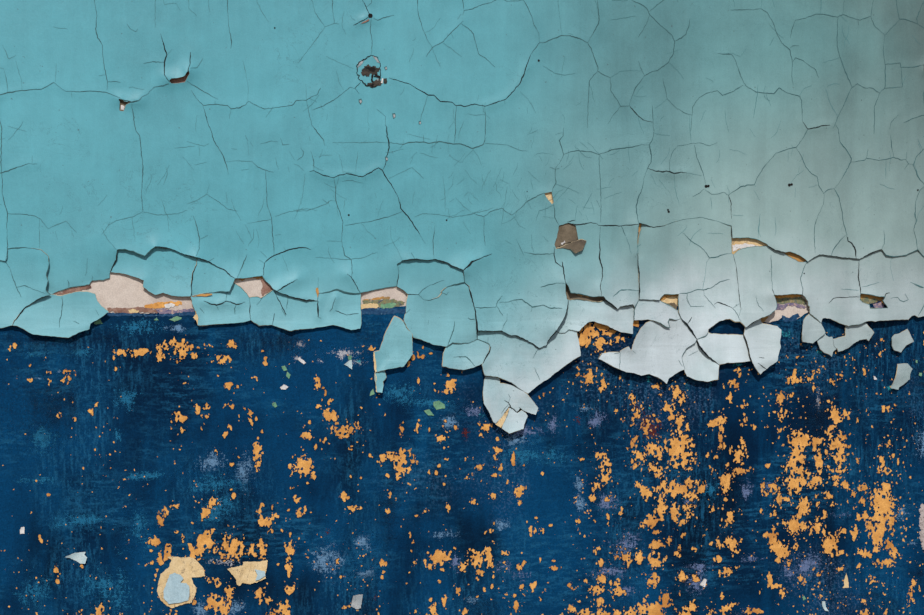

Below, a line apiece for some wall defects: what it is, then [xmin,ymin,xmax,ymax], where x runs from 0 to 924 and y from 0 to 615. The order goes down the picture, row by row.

spalling [356,55,387,88]
peeling [0,218,924,434]